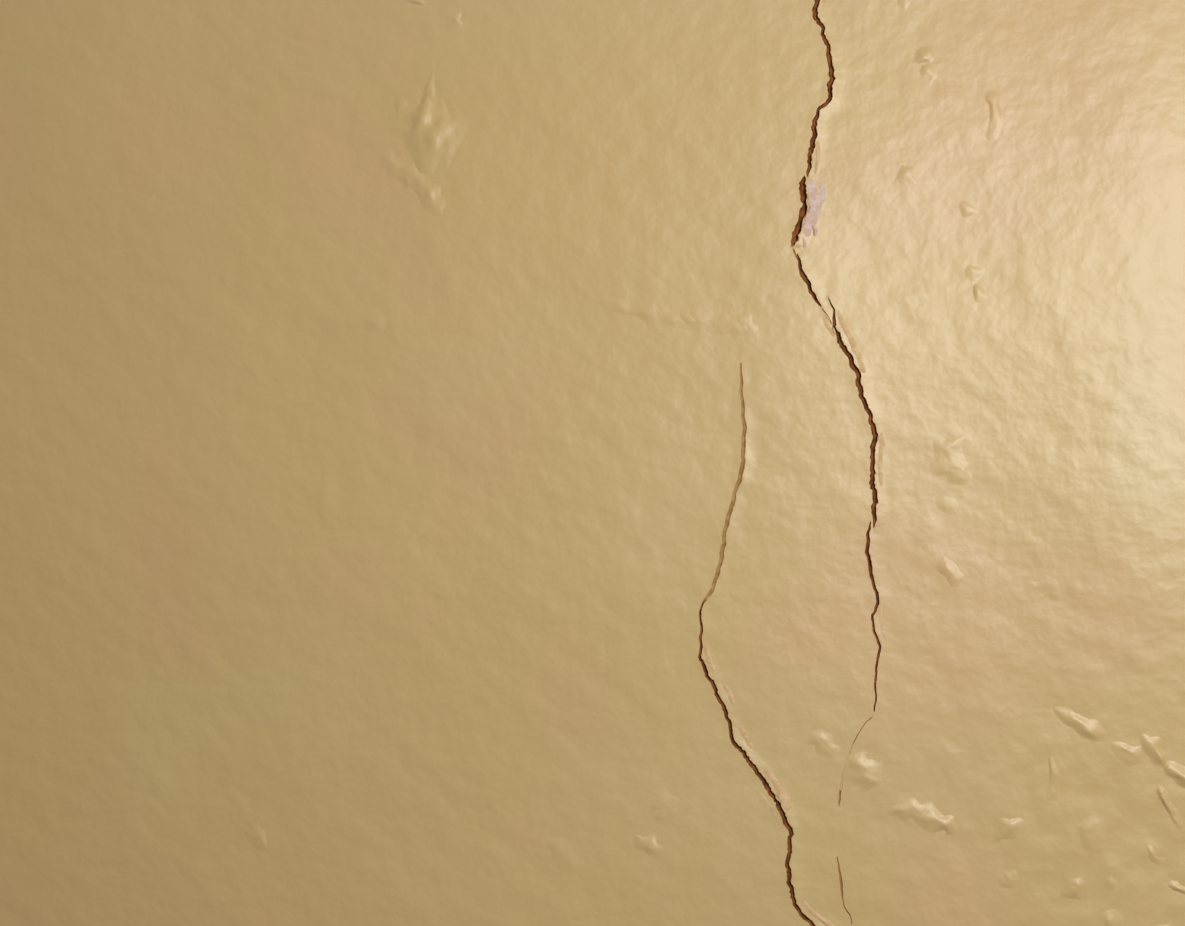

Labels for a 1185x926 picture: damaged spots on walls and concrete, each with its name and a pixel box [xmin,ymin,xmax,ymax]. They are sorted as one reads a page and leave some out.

crack [698,363,852,926]
flaking render [802,178,826,249]
crack [791,0,886,806]